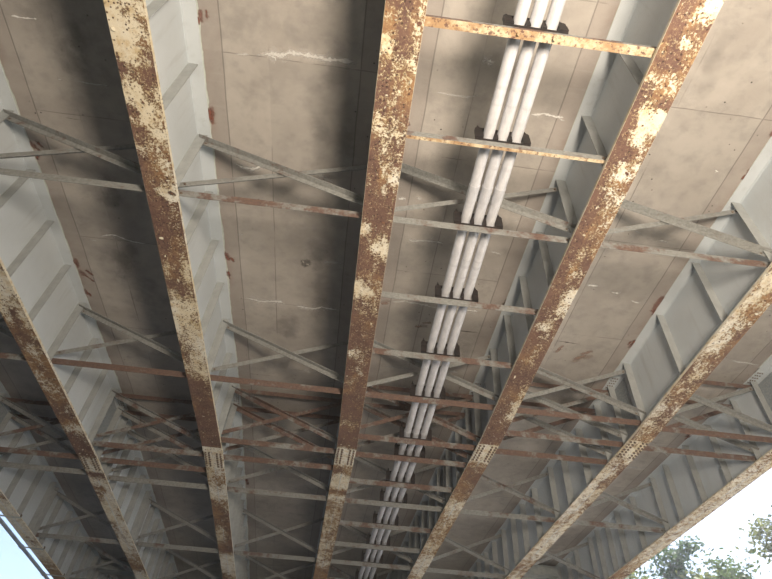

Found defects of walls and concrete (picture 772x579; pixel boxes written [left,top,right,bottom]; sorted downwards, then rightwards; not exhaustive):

corrosion [0,264,146,579]
corrosion [104,0,236,579]
crack [237,50,354,64]
corrosion [313,0,428,579]
corrosion [407,0,723,579]
corrosion [506,269,772,579]